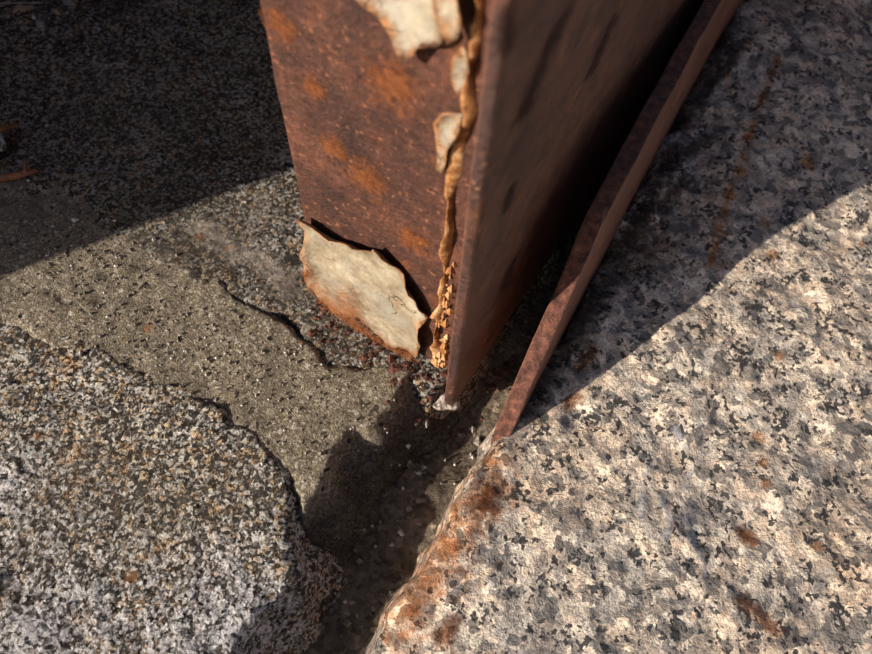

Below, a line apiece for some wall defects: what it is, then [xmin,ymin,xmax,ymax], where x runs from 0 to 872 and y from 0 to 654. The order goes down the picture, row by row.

peeling [356,0,470,95]
peeling [433,112,464,175]
rust [402,0,485,369]
peeling [296,219,429,359]
rust [559,390,582,410]
rust [470,485,501,522]
rust [435,614,463,651]